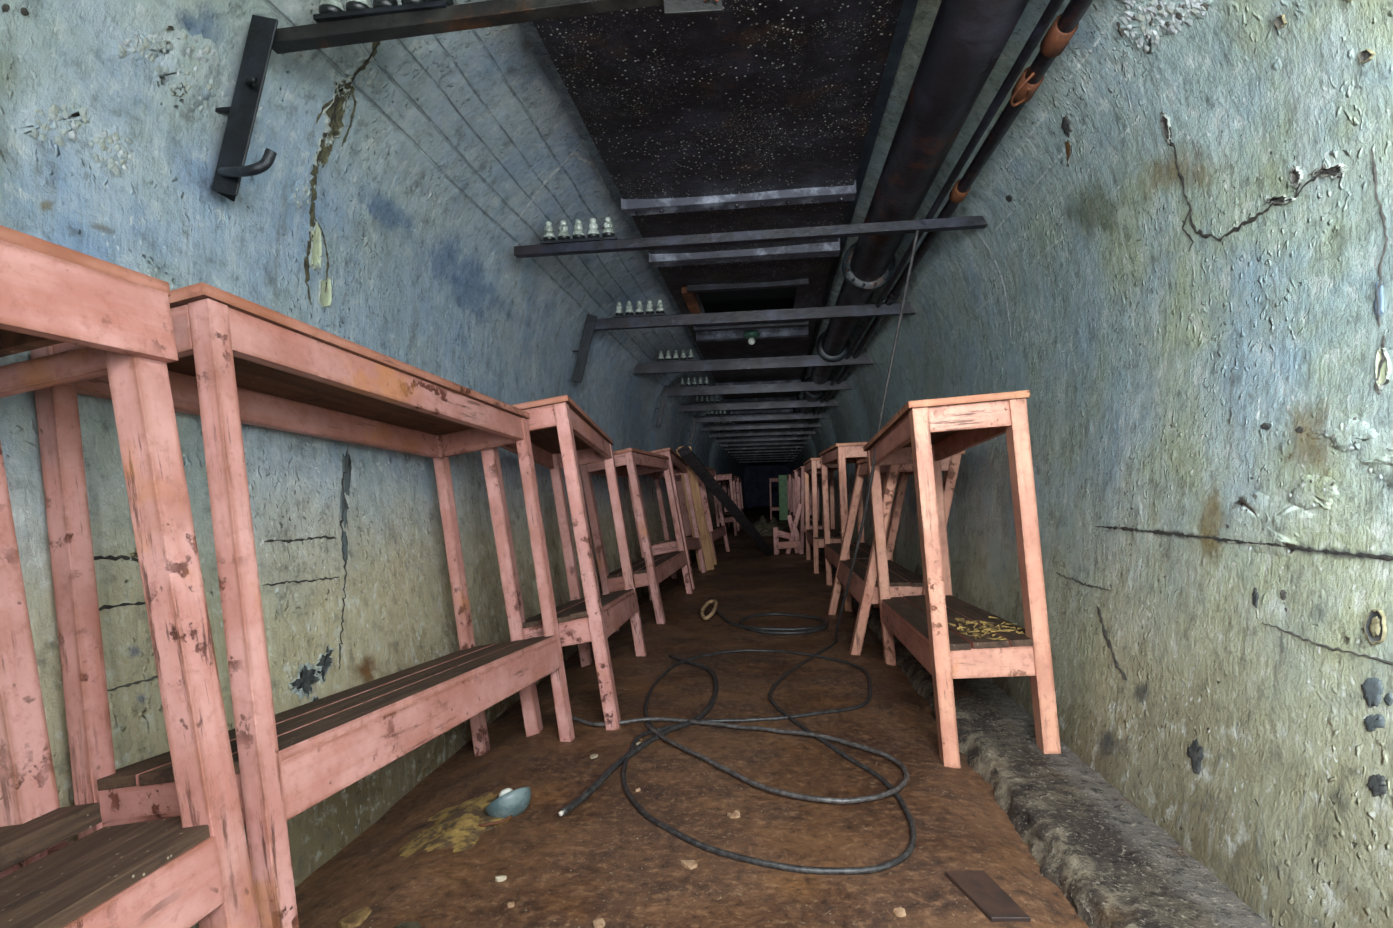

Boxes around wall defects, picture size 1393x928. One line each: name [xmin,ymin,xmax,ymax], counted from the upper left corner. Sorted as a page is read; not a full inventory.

crack [1162,112,1388,326]
crack [94,554,138,562]
crack [263,448,352,670]
crack [1095,526,1393,561]
crack [99,602,145,611]
crack [1056,572,1127,681]
crack [1261,622,1393,665]
crack [107,675,158,691]
peeling [1361,677,1393,732]